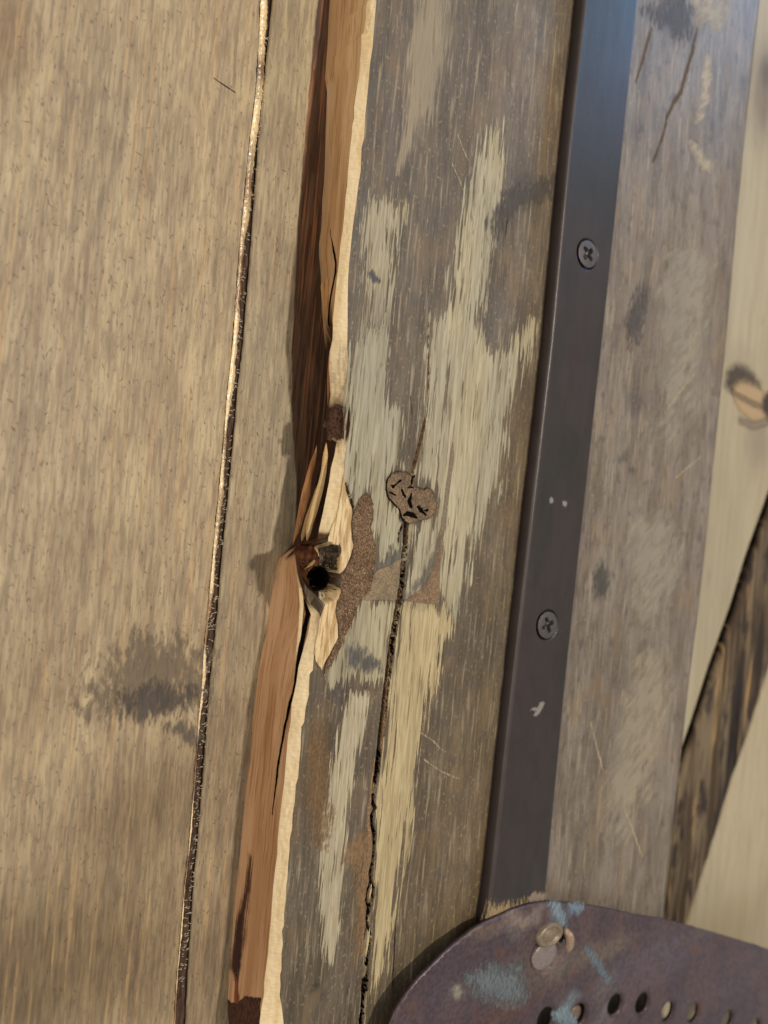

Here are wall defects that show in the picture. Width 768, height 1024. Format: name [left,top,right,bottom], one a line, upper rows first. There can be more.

peeling [311,475,354,669]
water stain [75,625,220,746]
crack [358,526,409,1024]